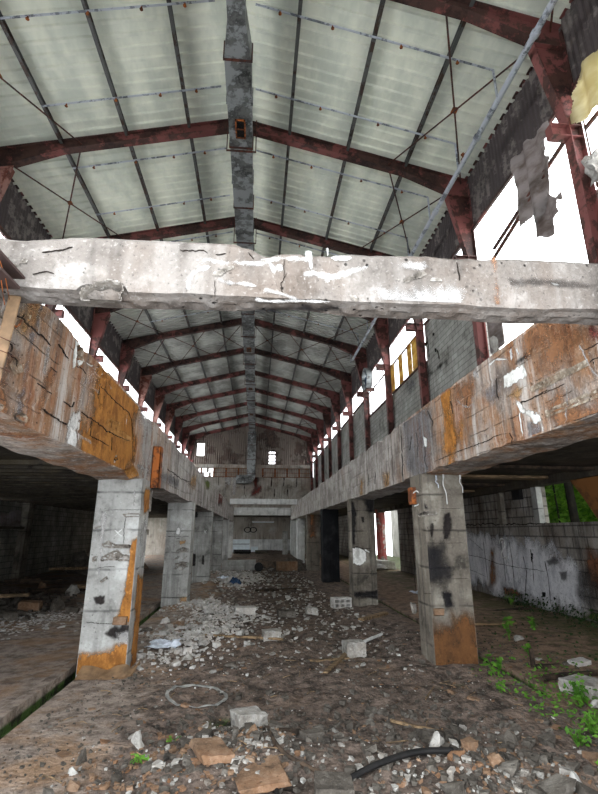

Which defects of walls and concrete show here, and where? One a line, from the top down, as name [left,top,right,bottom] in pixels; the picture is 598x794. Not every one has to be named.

spalling [79,279,124,305]
leakage [242,251,357,281]
rust [523,323,580,372]
crack [17,314,133,461]
rust [78,365,139,470]
rust [440,381,474,465]
crack [521,384,564,403]
rust [550,390,598,426]
peeling [466,531,581,613]
rust [76,538,143,675]
rust [433,613,478,666]